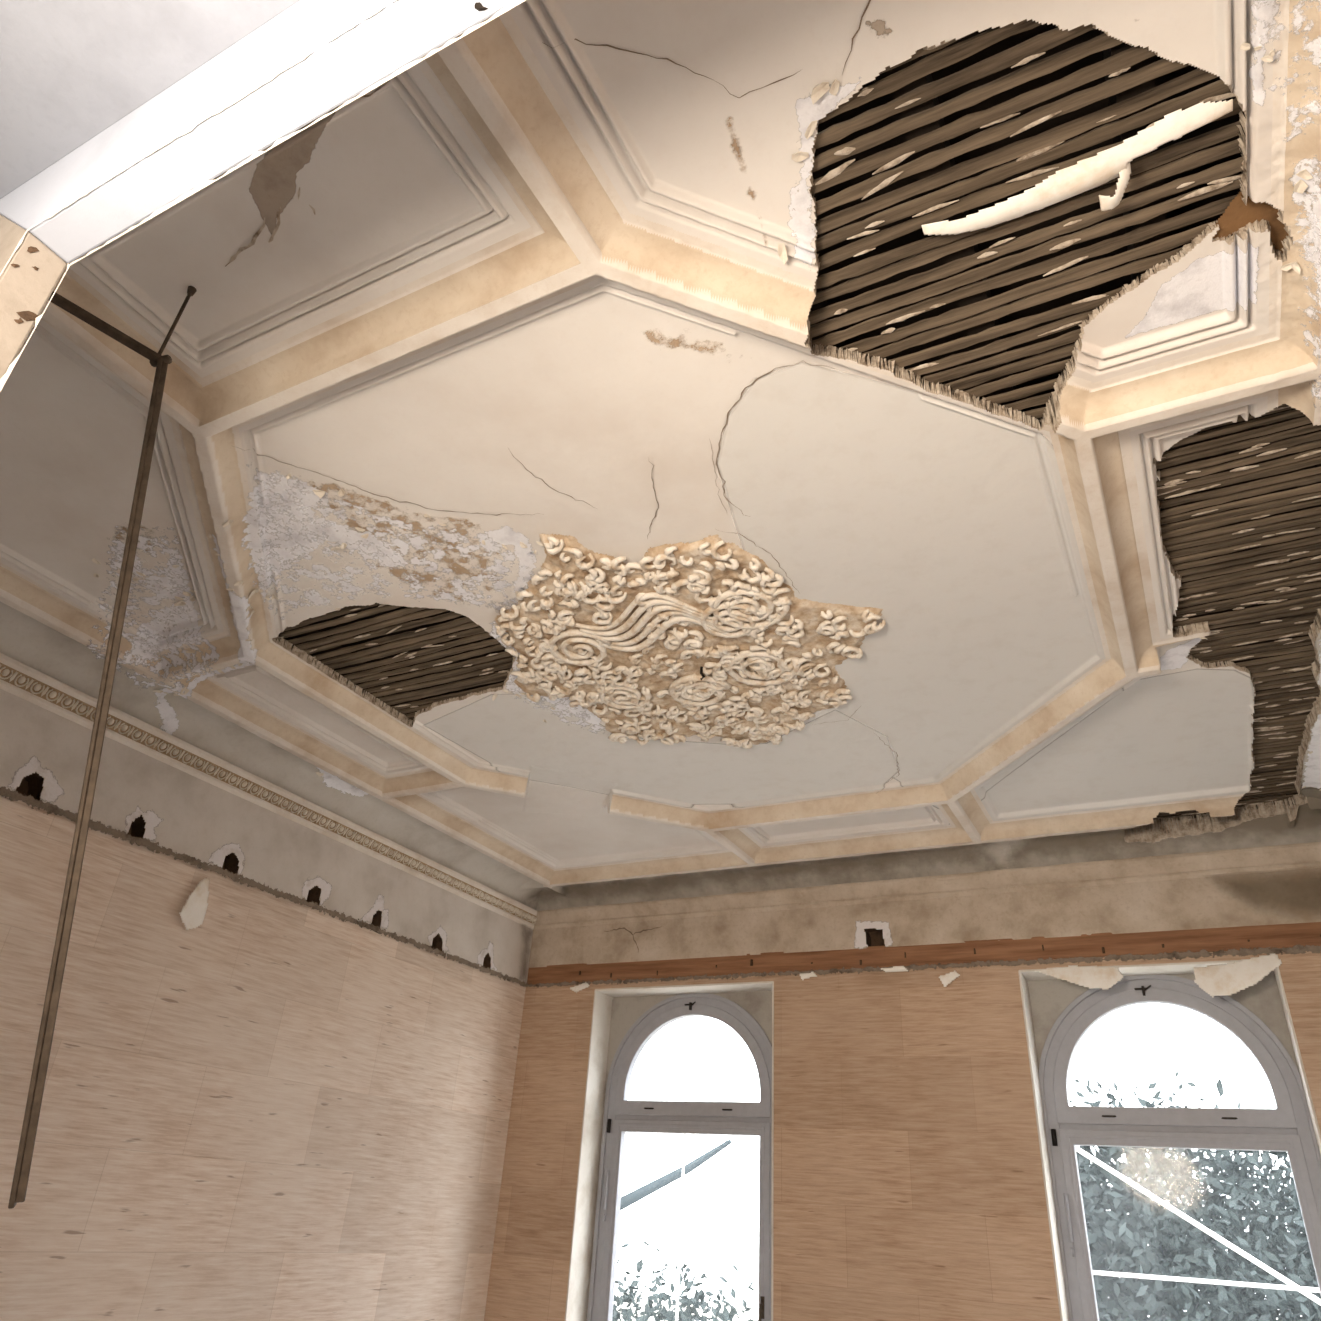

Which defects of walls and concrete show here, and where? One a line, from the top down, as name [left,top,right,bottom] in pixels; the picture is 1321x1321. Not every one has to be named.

crack [542,38,801,98]
crack [842,0,871,74]
peeling [0,0,525,392]
flaking render [778,0,1321,433]
crack [647,461,659,539]
crack [710,361,835,592]
flaking render [87,465,605,735]
flaking render [1124,375,1321,843]
spalling [8,756,65,802]
spalling [125,806,164,841]
spalling [208,843,245,877]
spalling [302,876,332,906]